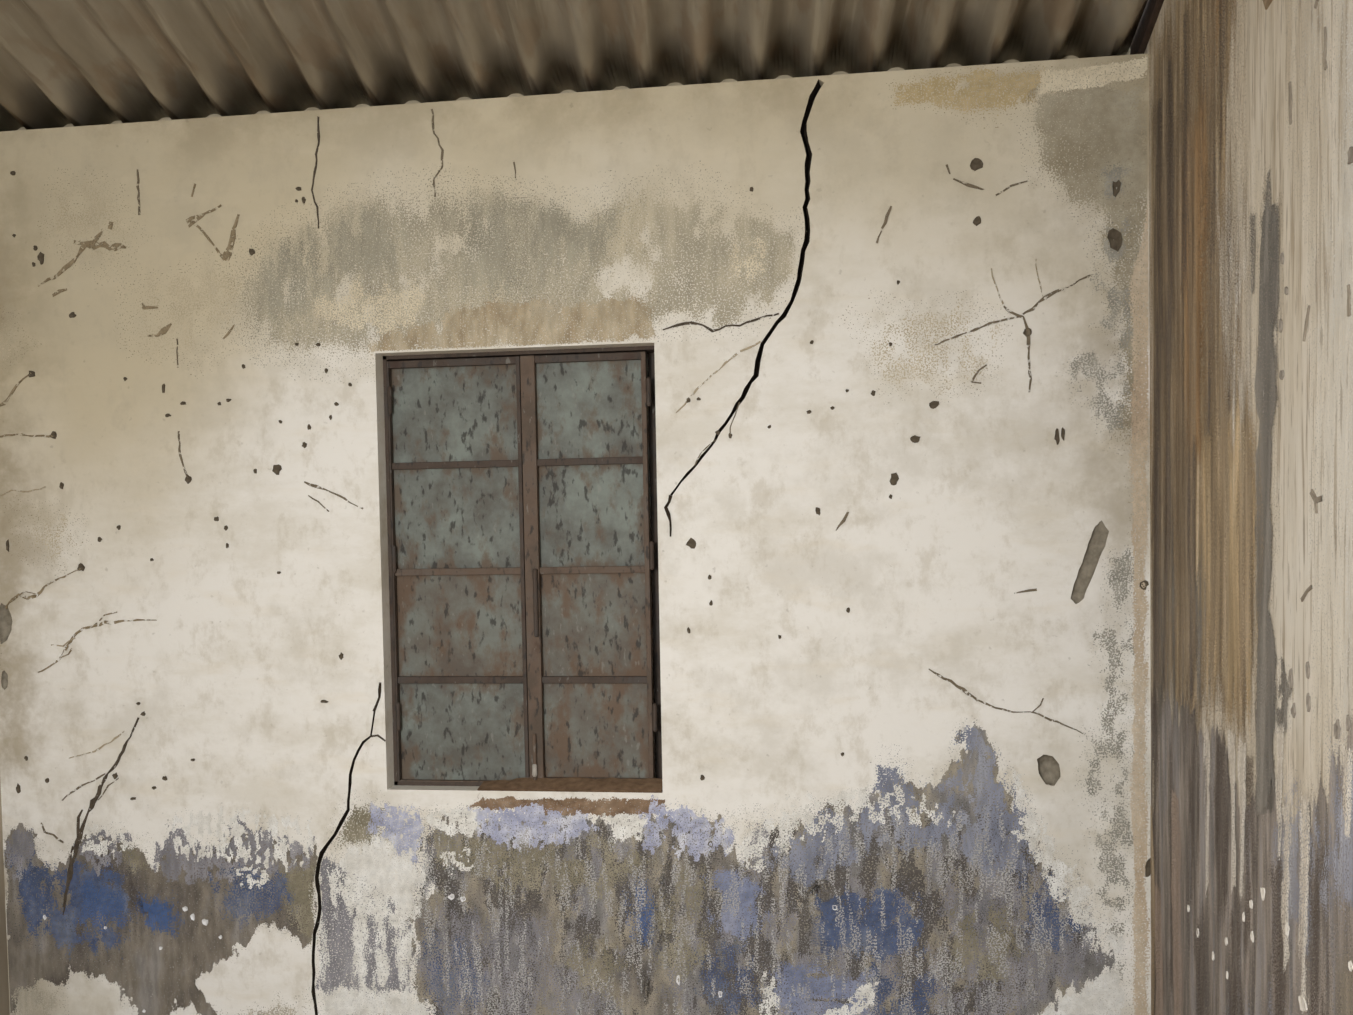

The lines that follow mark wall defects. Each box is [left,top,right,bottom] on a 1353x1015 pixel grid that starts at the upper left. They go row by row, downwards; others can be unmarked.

damp [123,178,798,365]
crack [663,80,824,537]
damp [863,299,1005,397]
crack [935,263,1090,392]
spalling [0,603,12,644]
peeling [3,205,1151,1015]
crack [929,669,1083,734]
damp [1037,169,1353,1015]
crack [41,718,139,914]
crack [311,682,386,1015]
damp [238,991,306,1015]
damp [320,981,430,1015]